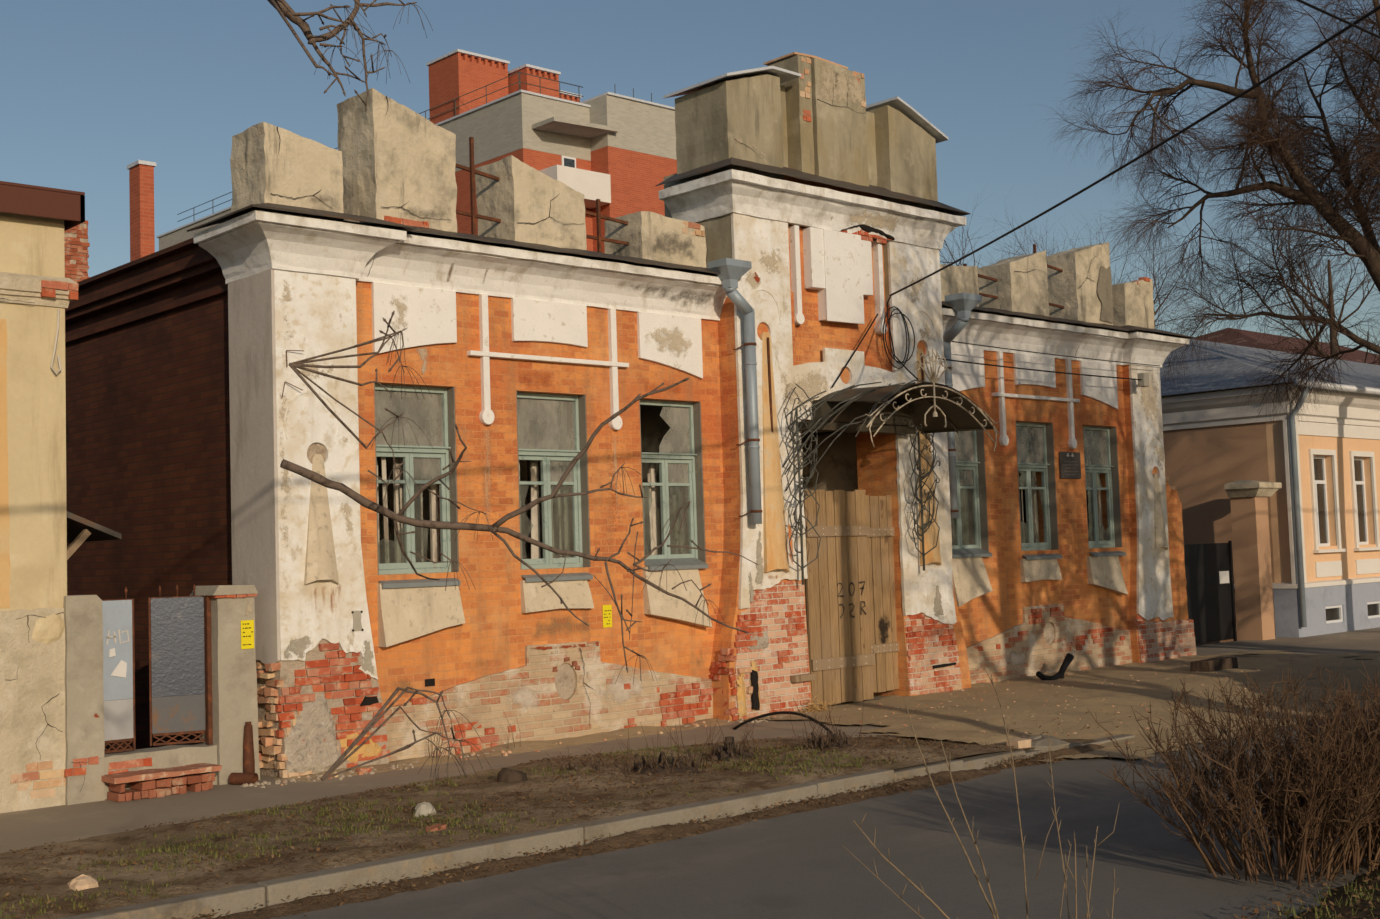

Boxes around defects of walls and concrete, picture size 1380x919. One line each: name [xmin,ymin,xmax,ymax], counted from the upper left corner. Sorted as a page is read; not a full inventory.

crack [517,193,575,224]
spalling [831,213,899,244]
spalling [535,642,599,672]
spalling [657,531,811,726]
spalling [904,586,1064,695]
spalling [1066,614,1179,663]
spalling [256,636,391,778]
spalling [449,721,516,755]
spalling [10,756,152,799]